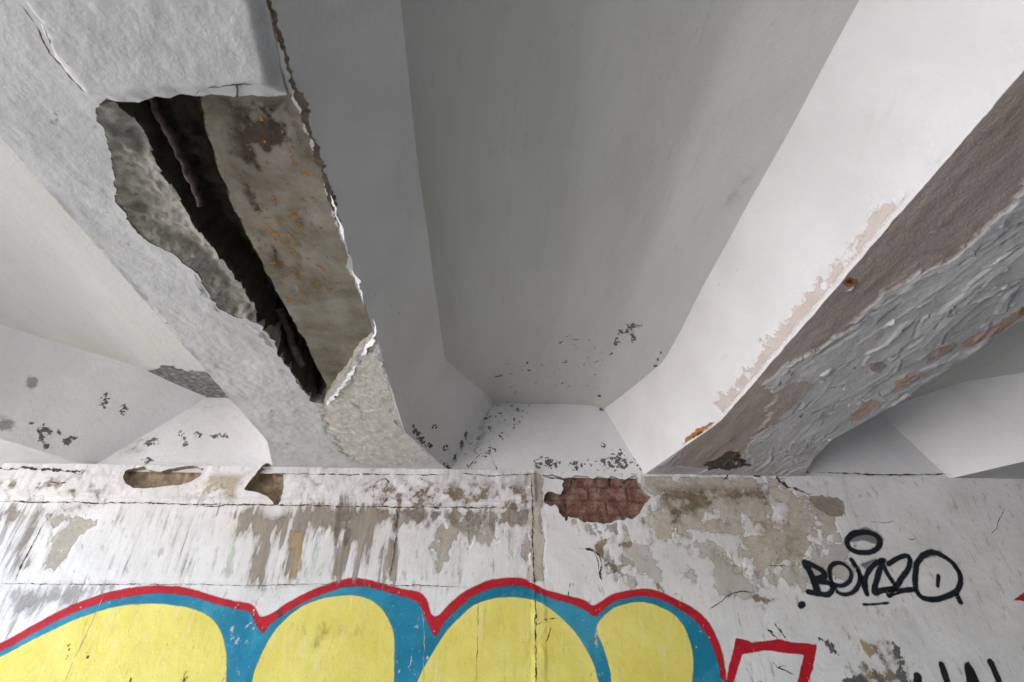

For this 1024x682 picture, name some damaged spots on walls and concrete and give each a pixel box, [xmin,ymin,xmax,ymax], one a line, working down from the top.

crack [22,6,84,92]
spalling [96,86,431,466]
peeling [509,72,1024,600]
rust [685,422,713,443]
hole [123,465,203,488]
flaking render [244,463,284,506]
peeling [397,505,504,573]